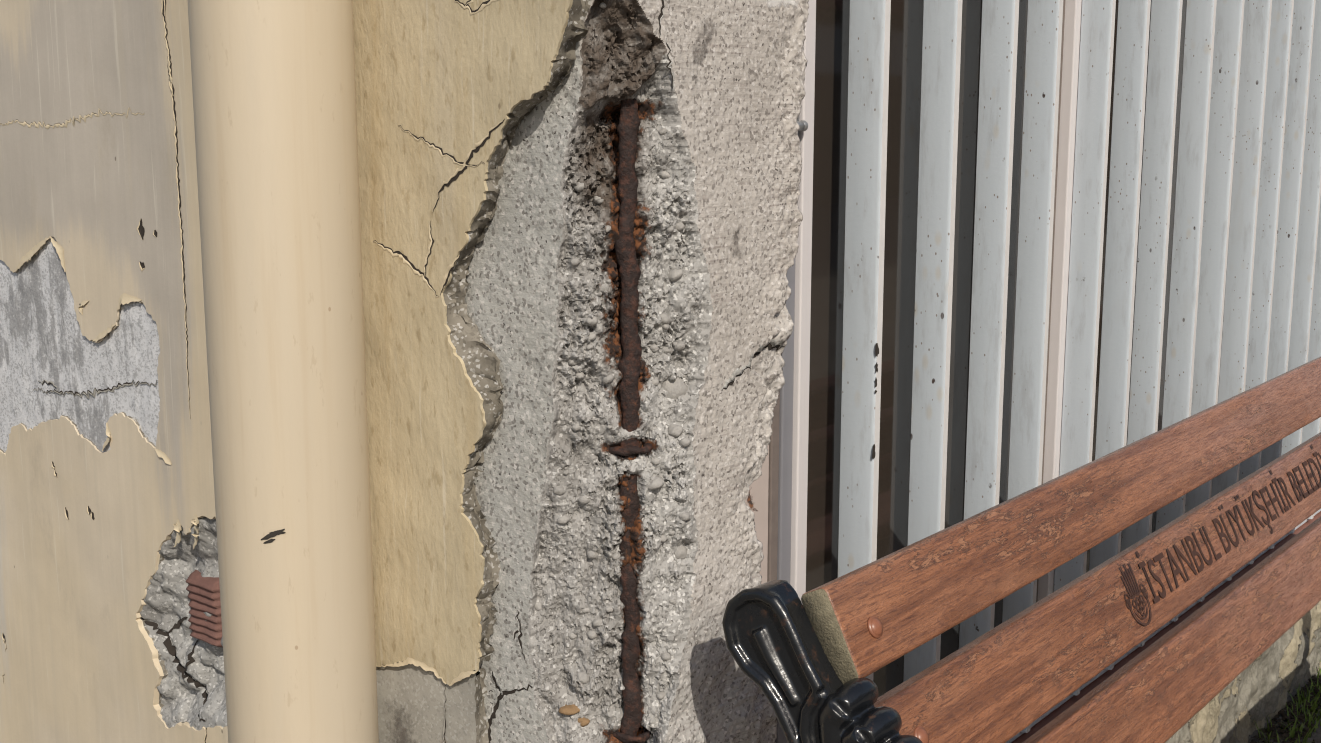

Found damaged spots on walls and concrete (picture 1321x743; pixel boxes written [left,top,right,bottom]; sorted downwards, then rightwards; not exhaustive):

crack [454,0,497,15]
crack [373,119,504,298]
rust [636,99,665,171]
peeling [0,236,172,465]
spalling [528,0,714,743]
rust [598,101,658,743]
crack [721,339,785,391]
flaking render [742,301,794,543]
flaking render [140,513,227,730]
peeling [376,657,489,743]